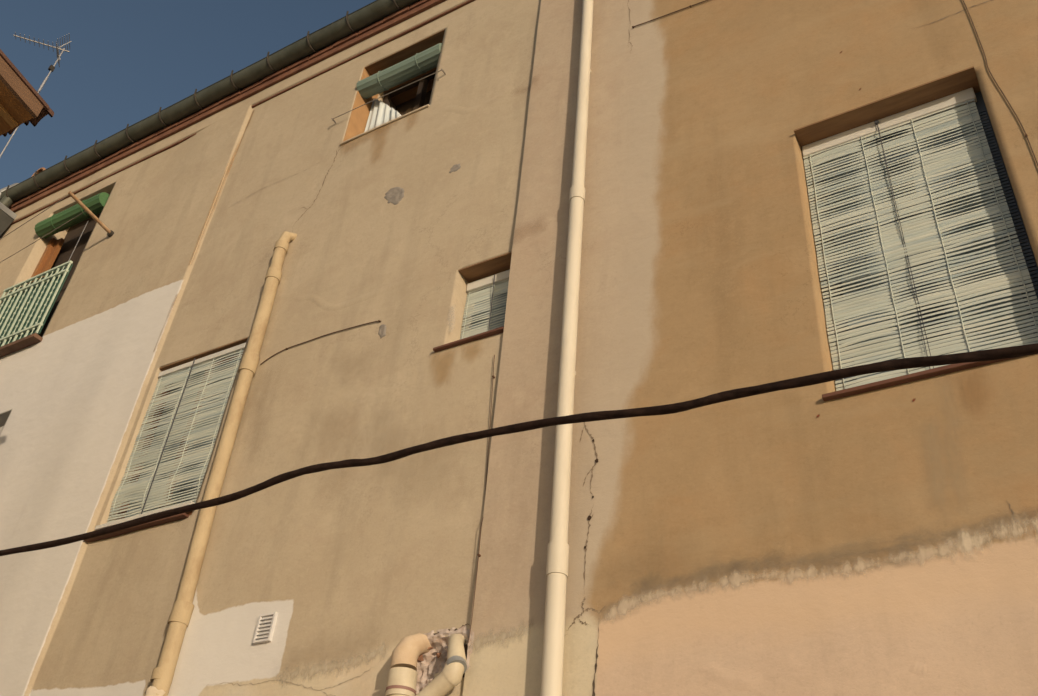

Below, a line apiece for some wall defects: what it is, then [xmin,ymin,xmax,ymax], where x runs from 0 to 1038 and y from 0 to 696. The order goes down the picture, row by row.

spalling [384,187,405,205]
crack [568,422,605,696]